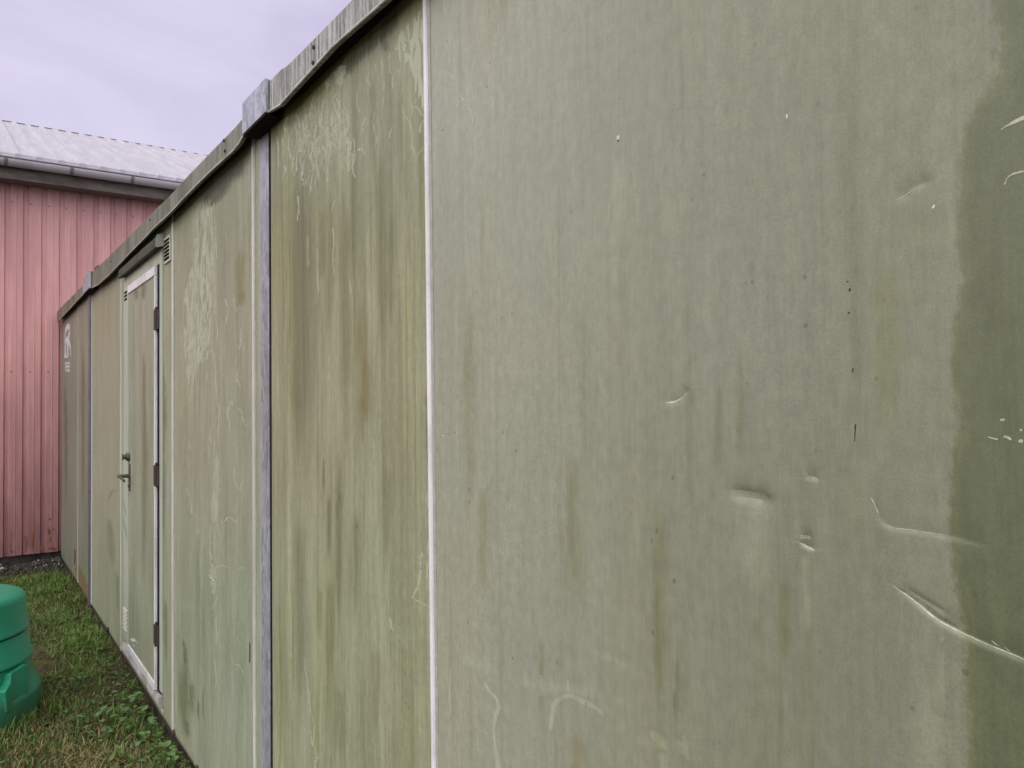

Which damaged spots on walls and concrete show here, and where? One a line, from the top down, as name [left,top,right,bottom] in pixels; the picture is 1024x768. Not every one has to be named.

water stain [902,0,1024,768]